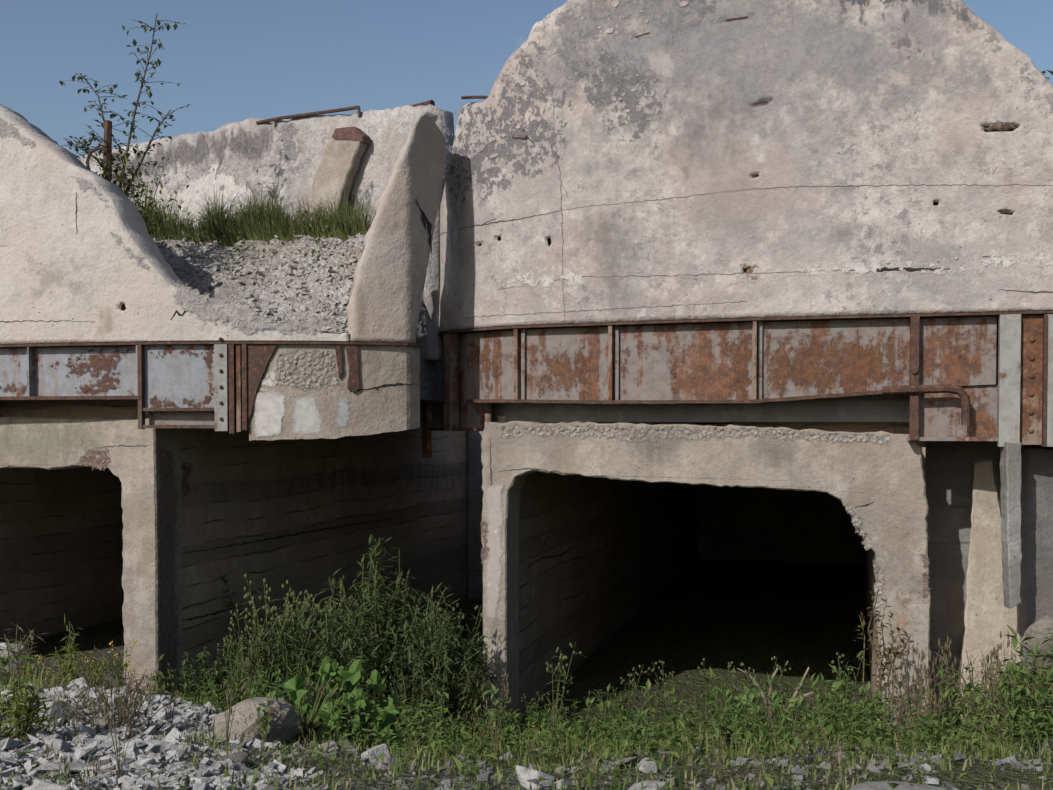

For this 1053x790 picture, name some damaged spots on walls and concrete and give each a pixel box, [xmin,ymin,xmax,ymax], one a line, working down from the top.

corrosion [536,346,590,399]
corrosion [718,330,905,398]